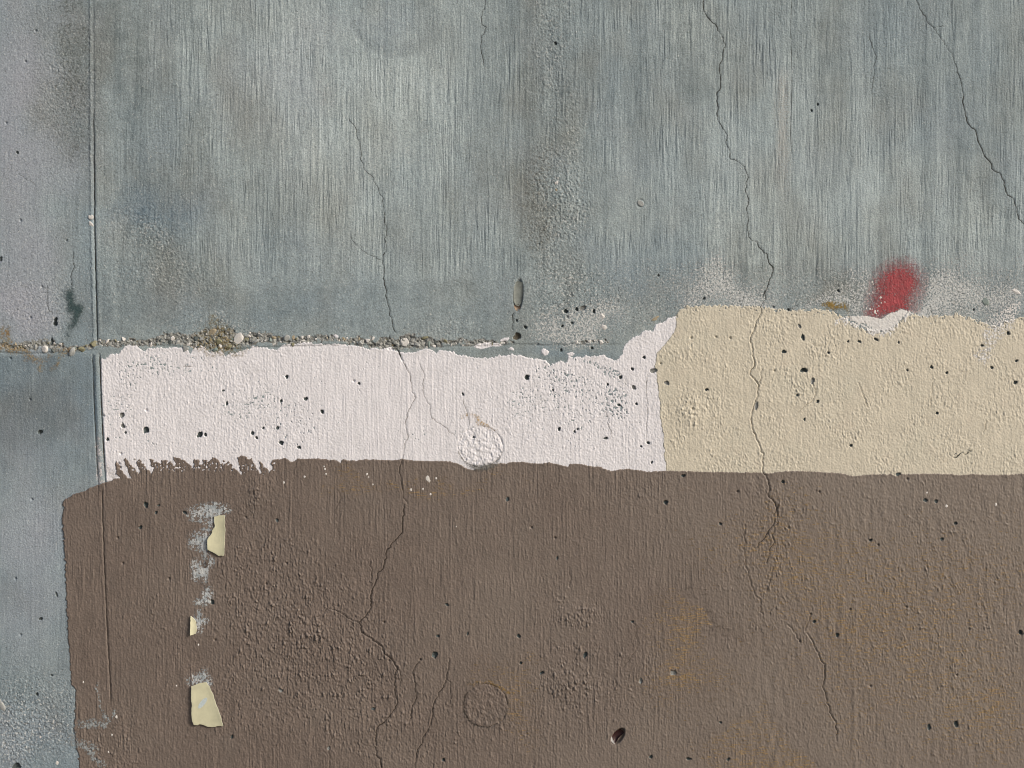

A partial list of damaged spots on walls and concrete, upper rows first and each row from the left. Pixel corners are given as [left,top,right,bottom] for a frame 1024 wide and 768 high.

crack [916,0,1024,224]
crack [703,1,778,613]
peeling [190,609,210,635]
peeling [186,669,223,727]
peeling [186,502,231,563]
crack [317,119,471,768]